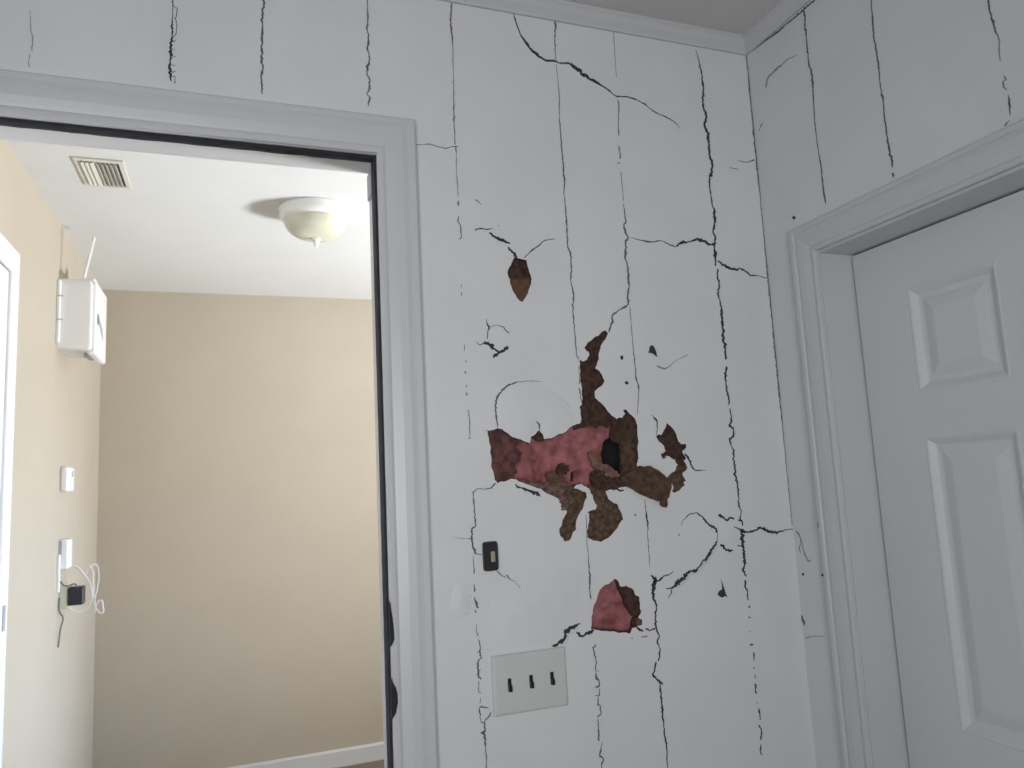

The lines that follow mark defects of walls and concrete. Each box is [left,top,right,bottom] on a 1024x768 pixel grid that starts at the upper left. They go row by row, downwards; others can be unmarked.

crack [168,0,178,83]
crack [258,0,266,94]
crack [364,0,372,106]
crack [416,3,481,239]
crack [871,0,894,177]
crack [987,0,1011,126]
spalling [475,225,553,302]
crack [464,319,540,439]
spalling [488,331,706,542]
crack [513,0,826,768]
crack [454,483,540,768]
spalling [591,579,642,634]